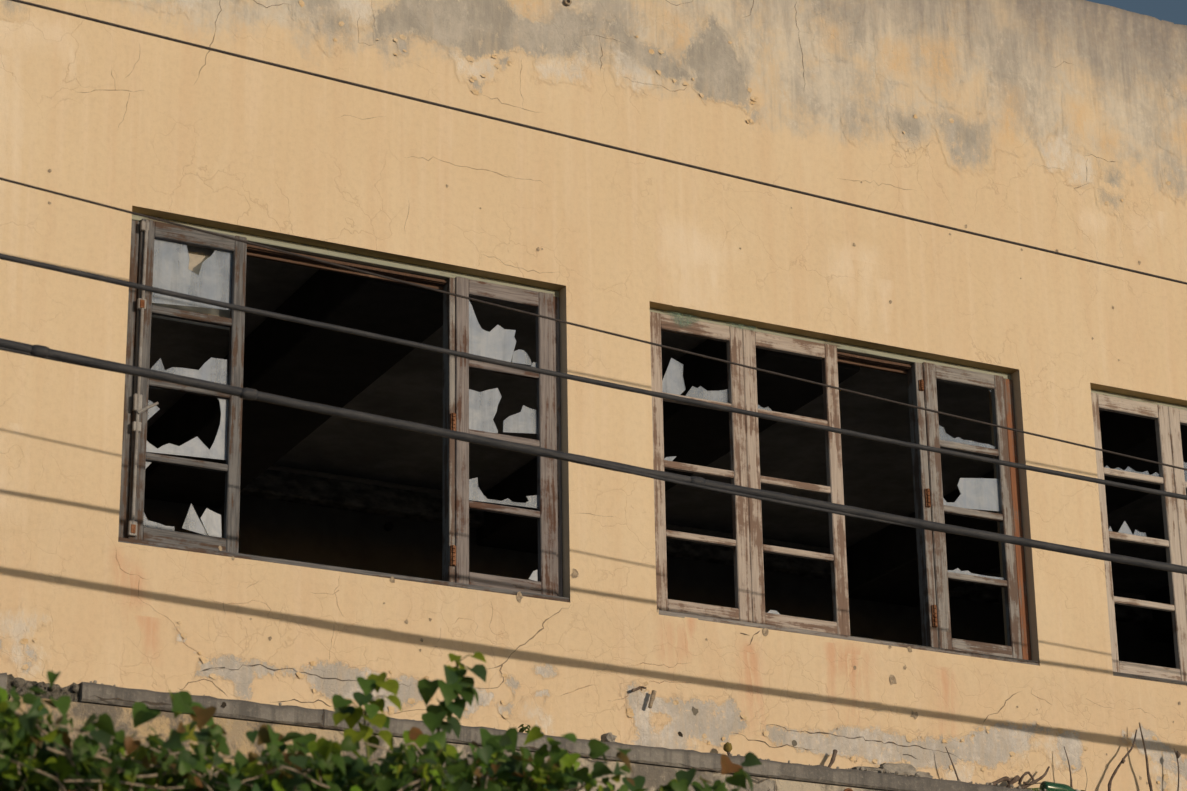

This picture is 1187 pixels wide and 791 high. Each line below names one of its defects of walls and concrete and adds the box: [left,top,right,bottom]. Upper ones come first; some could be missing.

damp [508,0,565,25]
peeling [368,0,764,125]
damp [806,9,972,108]
damp [1071,0,1187,162]
damp [0,1,98,320]
damp [983,71,1170,258]
spalling [6,636,80,702]
crack [96,664,355,731]
peeling [167,618,433,715]
crack [483,610,561,689]
peeling [624,680,1088,775]
peeling [1121,722,1187,791]